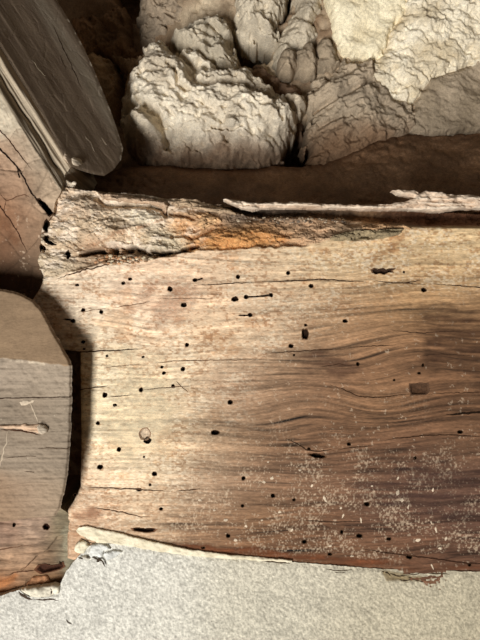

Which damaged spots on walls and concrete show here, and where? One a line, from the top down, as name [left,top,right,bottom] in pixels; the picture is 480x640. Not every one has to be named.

crack [0,130,42,251]